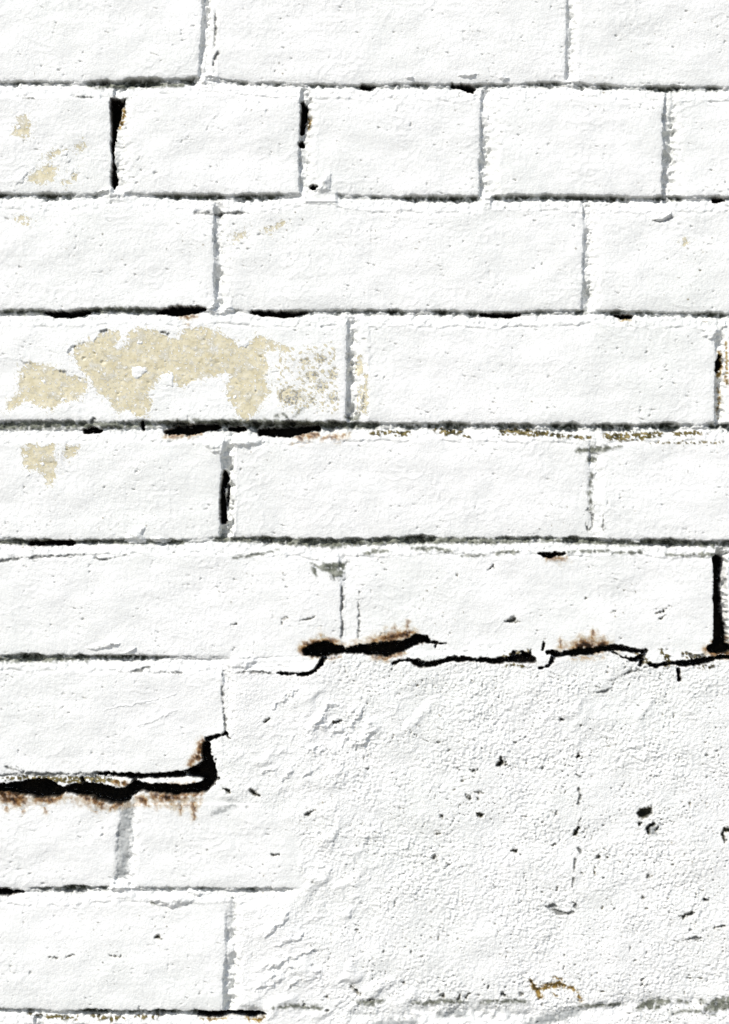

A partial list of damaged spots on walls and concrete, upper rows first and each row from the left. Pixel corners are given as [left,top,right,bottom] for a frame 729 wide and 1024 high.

peeling [6,326,339,425]
peeling [355,354,369,413]
peeling [21,443,80,488]
corrosion [299,634,338,659]
corrosion [372,625,415,661]
corrosion [559,630,608,659]
crack [392,643,729,693]
corrosion [188,739,205,767]
corrosion [0,775,129,812]
corrosion [137,782,203,819]